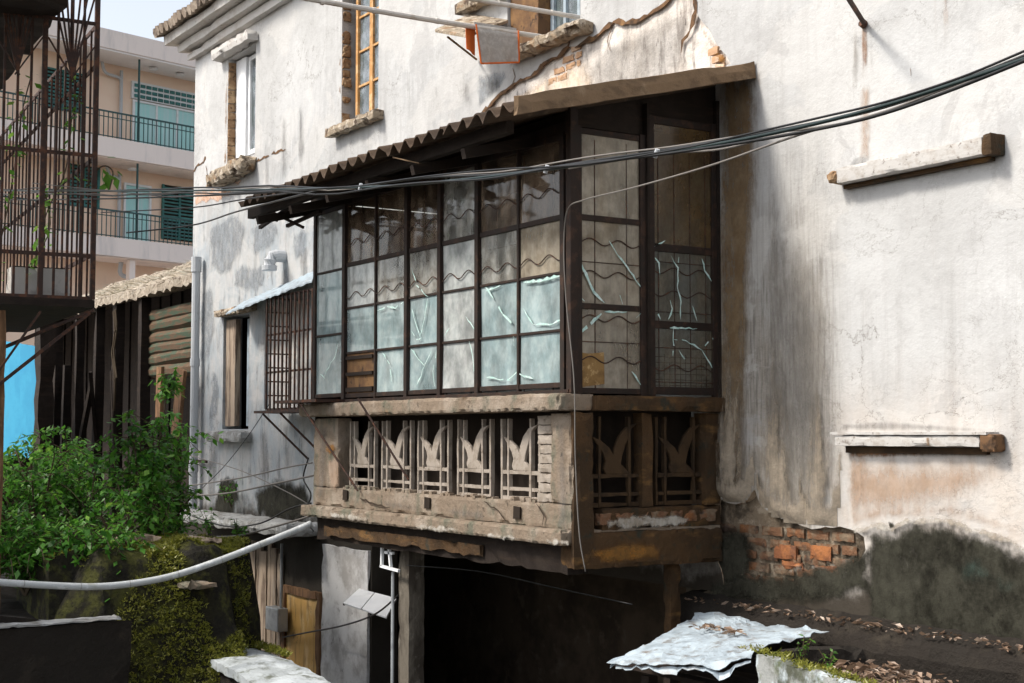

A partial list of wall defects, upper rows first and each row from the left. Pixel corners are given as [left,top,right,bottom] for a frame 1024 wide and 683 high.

flaking render [227,63,236,163]
peeling [479,0,731,112]
flaking render [595,490,869,604]
leakage [851,453,1024,639]